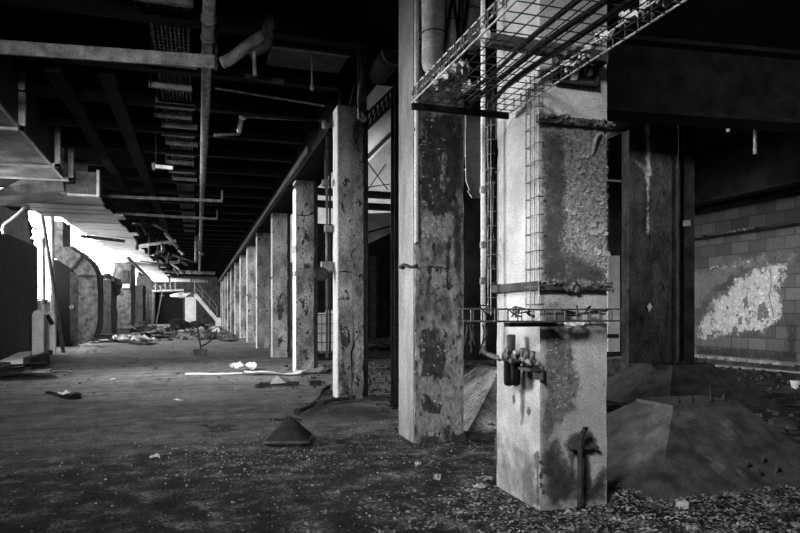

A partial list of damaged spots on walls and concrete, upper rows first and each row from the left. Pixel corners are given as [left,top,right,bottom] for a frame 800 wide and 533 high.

water stain [445,211,461,281]
water stain [455,120,463,189]
peeling [542,127,611,282]
water stain [636,123,651,232]
peeling [695,252,796,340]
crack [351,324,362,389]
peeling [421,329,463,431]
water stain [547,312,572,384]
water stain [542,404,606,507]